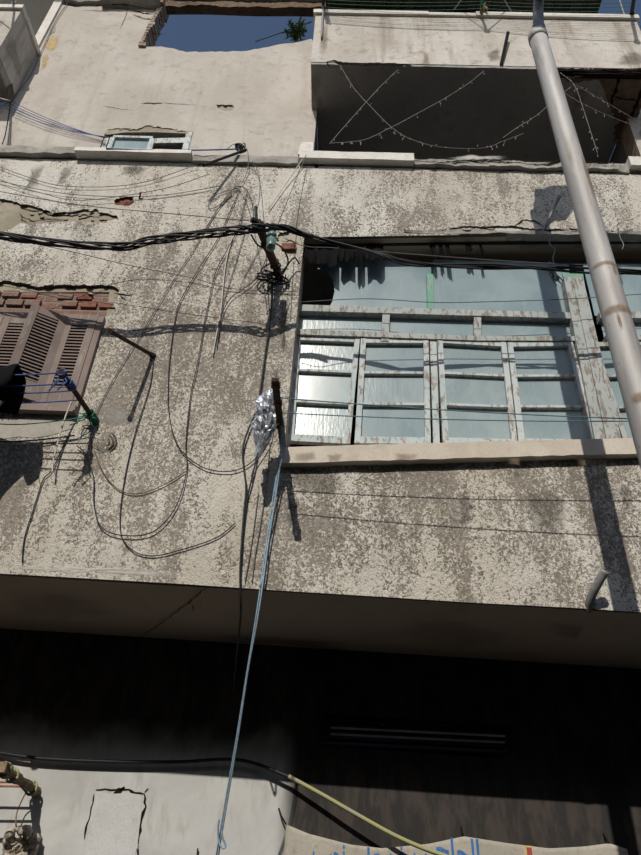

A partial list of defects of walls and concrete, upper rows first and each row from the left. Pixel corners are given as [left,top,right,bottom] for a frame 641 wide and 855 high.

spalling [100,0,167,48]
flaking render [104,125,193,135]
flaking render [0,197,118,232]
flaking render [115,197,134,206]
flaking render [0,280,115,317]